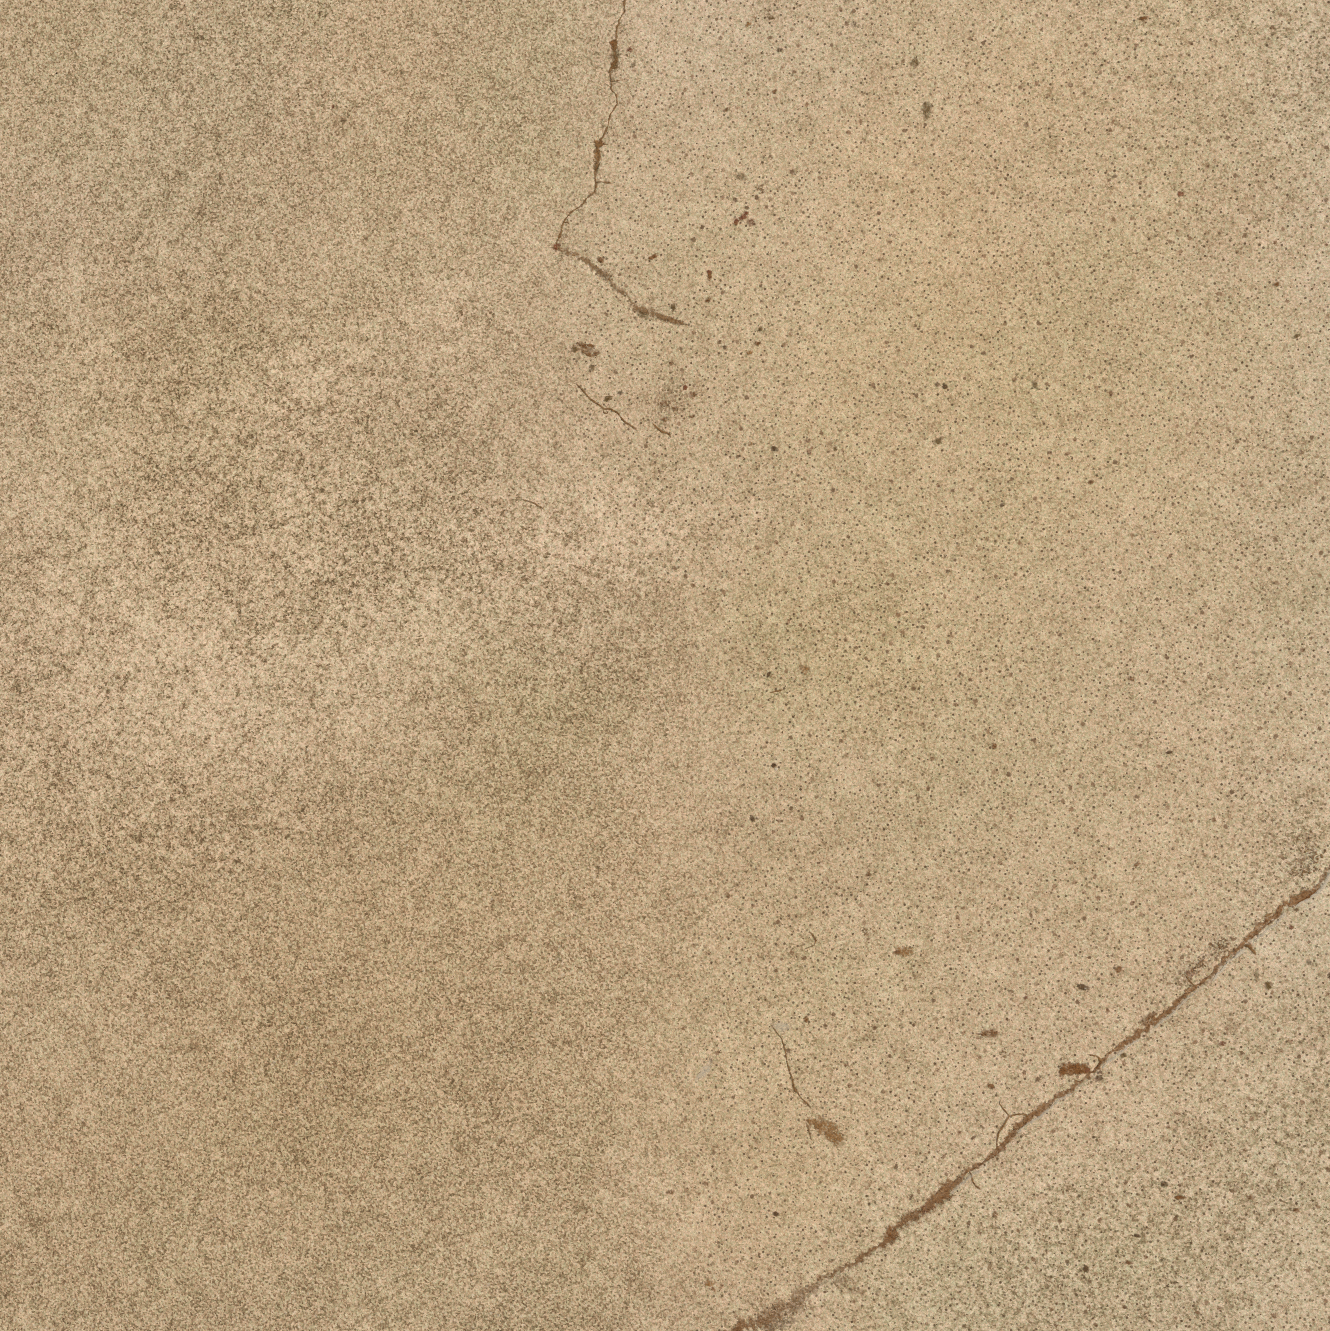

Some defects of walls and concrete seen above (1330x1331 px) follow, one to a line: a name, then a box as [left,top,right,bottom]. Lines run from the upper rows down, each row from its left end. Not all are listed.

crack [552,0,687,325]
crack [771,1025,812,1140]
crack [811,868,1330,1289]
crack [724,1312,771,1331]